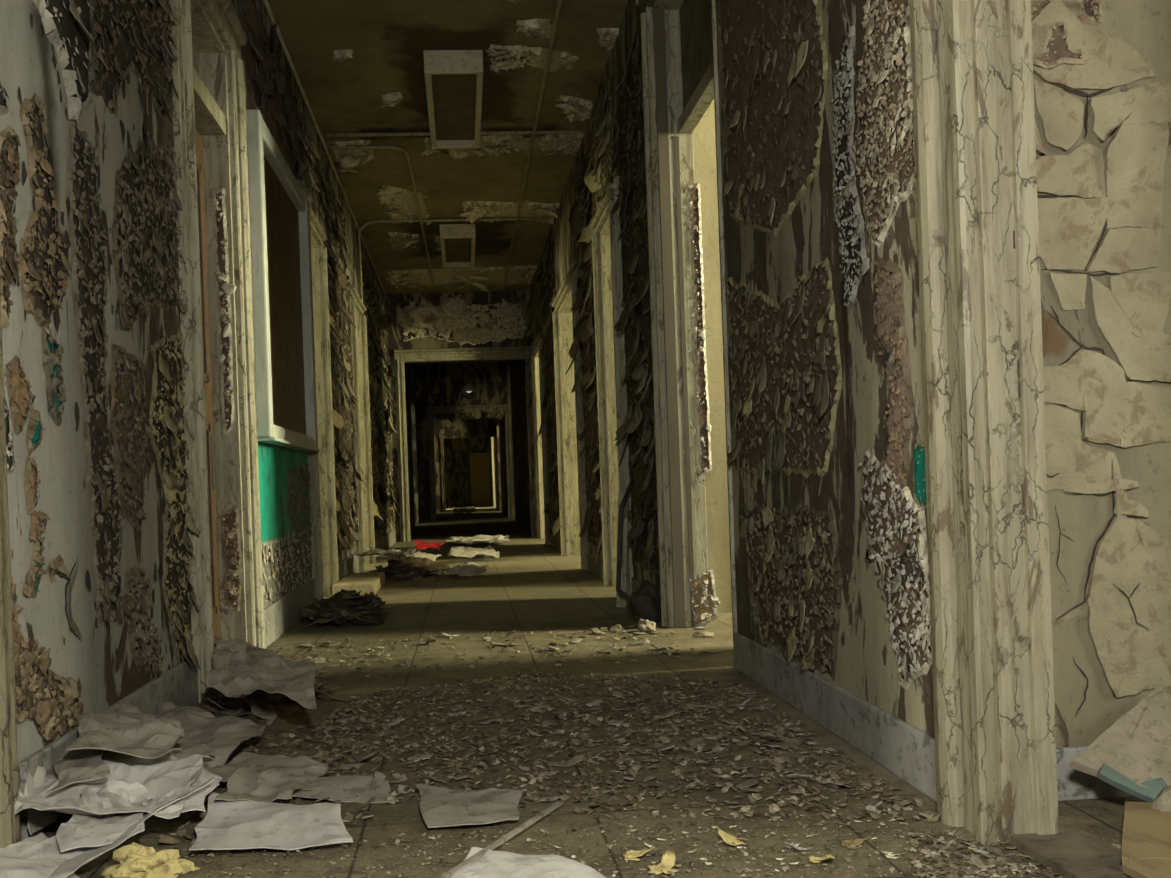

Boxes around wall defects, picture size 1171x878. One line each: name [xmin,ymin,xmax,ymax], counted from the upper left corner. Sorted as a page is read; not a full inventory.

crack [1050,83,1115,139]
peeling [0,0,204,740]
peeling [211,187,236,435]
peeling [231,0,660,582]
peeling [687,182,712,475]
peeling [717,0,932,706]
crack [1046,306,1106,365]
crack [1037,195,1120,276]
peeling [211,505,242,612]
peeling [261,463,313,608]
crack [1047,402,1150,630]
crack [1055,657,1088,726]